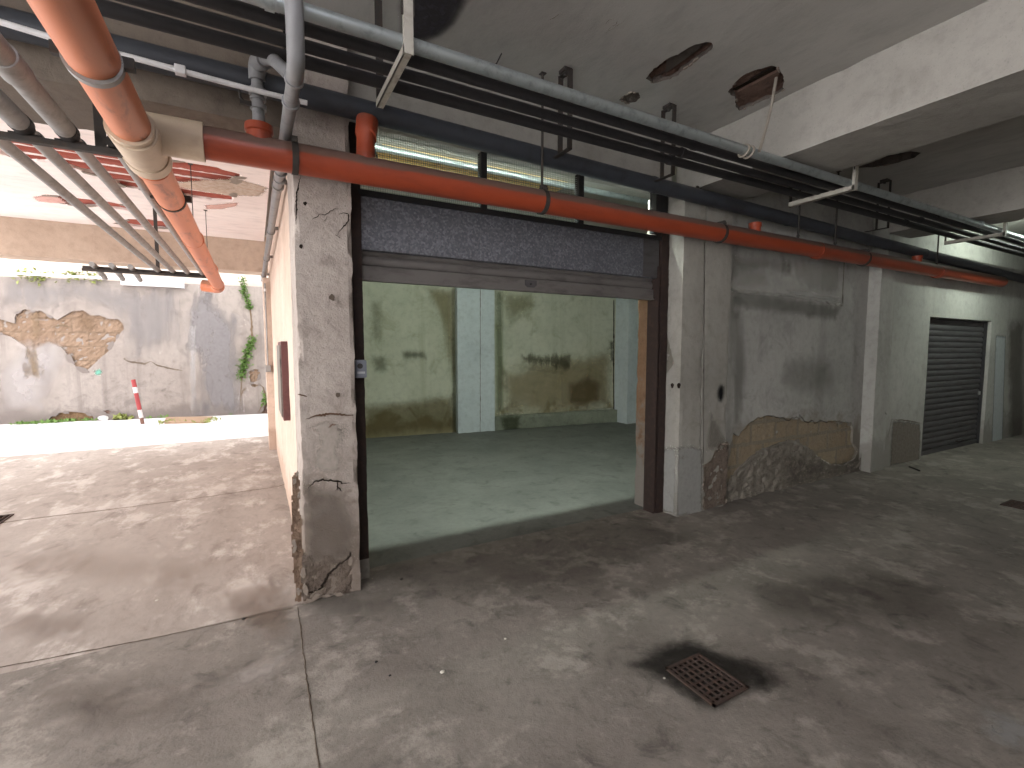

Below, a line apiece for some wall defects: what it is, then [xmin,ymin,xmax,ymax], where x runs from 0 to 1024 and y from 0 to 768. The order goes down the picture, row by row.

spalling [731,66,785,110]
spalling [11,141,140,190]
spalling [172,160,266,209]
crack [295,176,349,238]
spalling [0,309,124,379]
crack [298,394,353,428]
leakage [369,354,456,431]
leakage [498,309,519,430]
leakage [526,355,570,368]
crack [307,479,347,492]
spalling [291,471,353,602]
crack [2,552,351,768]